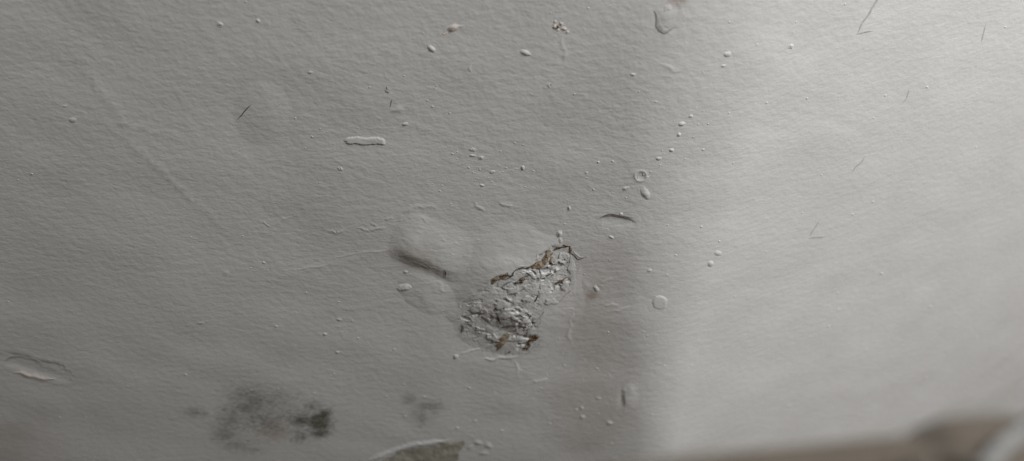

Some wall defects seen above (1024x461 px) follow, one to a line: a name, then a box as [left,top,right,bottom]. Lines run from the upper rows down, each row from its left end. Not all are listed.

flaking render [456,243,581,357]
mould [297,411,328,436]
peeling [366,439,494,461]